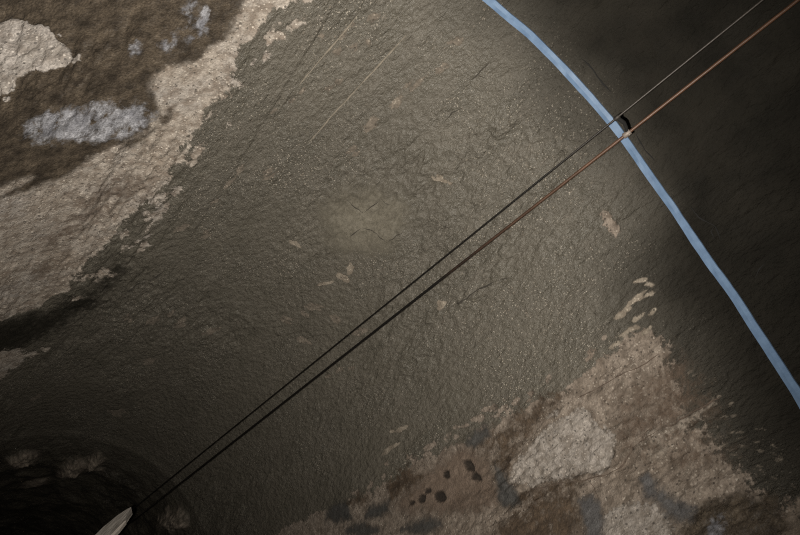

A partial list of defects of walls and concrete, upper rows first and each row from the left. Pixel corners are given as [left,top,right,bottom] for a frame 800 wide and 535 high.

damp [0,0,243,195]
peeling [0,0,313,321]
peeling [278,278,800,535]